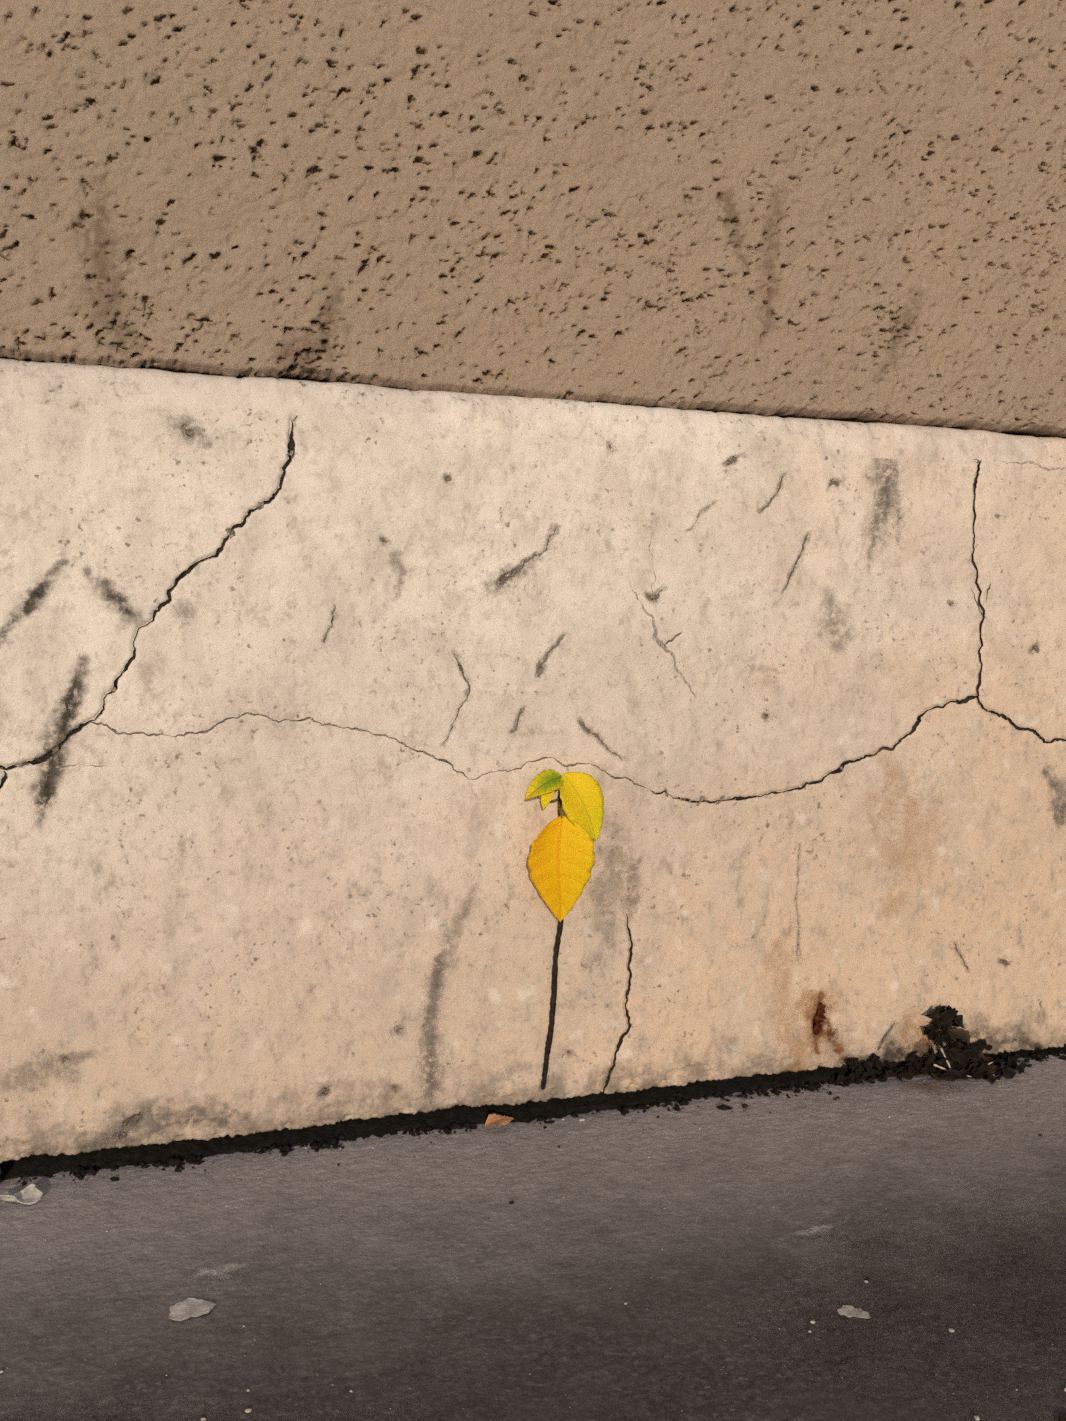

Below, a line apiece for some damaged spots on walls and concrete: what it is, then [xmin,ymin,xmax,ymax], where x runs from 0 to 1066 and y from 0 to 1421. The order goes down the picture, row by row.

crack [0,415,1066,806]
crack [603,914,633,1094]
rust [790,992,845,1071]